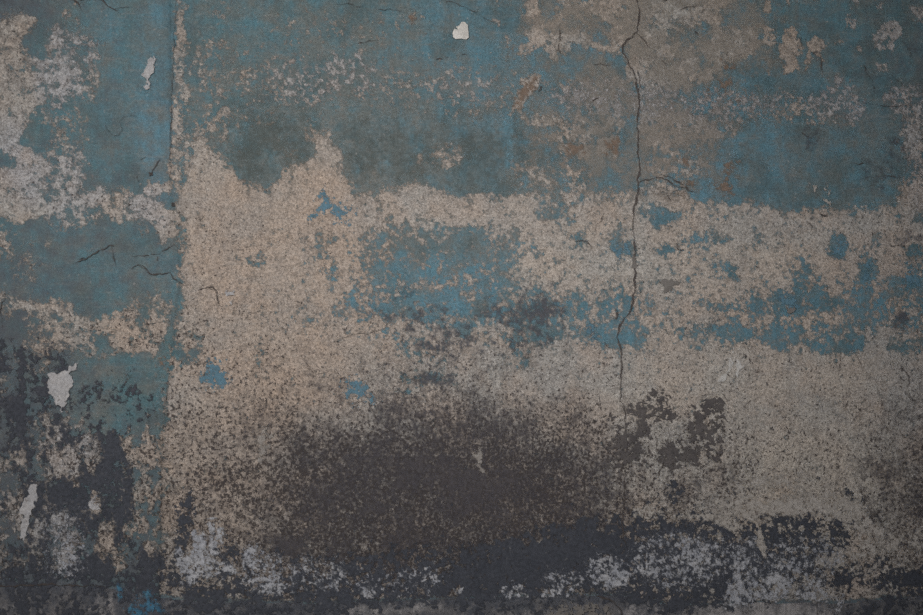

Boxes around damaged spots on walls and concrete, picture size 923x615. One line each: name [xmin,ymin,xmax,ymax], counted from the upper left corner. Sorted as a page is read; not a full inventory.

spalling [446,22,469,45]
peeling [872,20,903,51]
spalling [141,56,156,90]
peeling [233,36,500,122]
peeling [417,142,464,170]
crack [593,0,694,431]
damp [479,293,565,345]
damp [413,325,476,397]
damp [0,337,923,615]